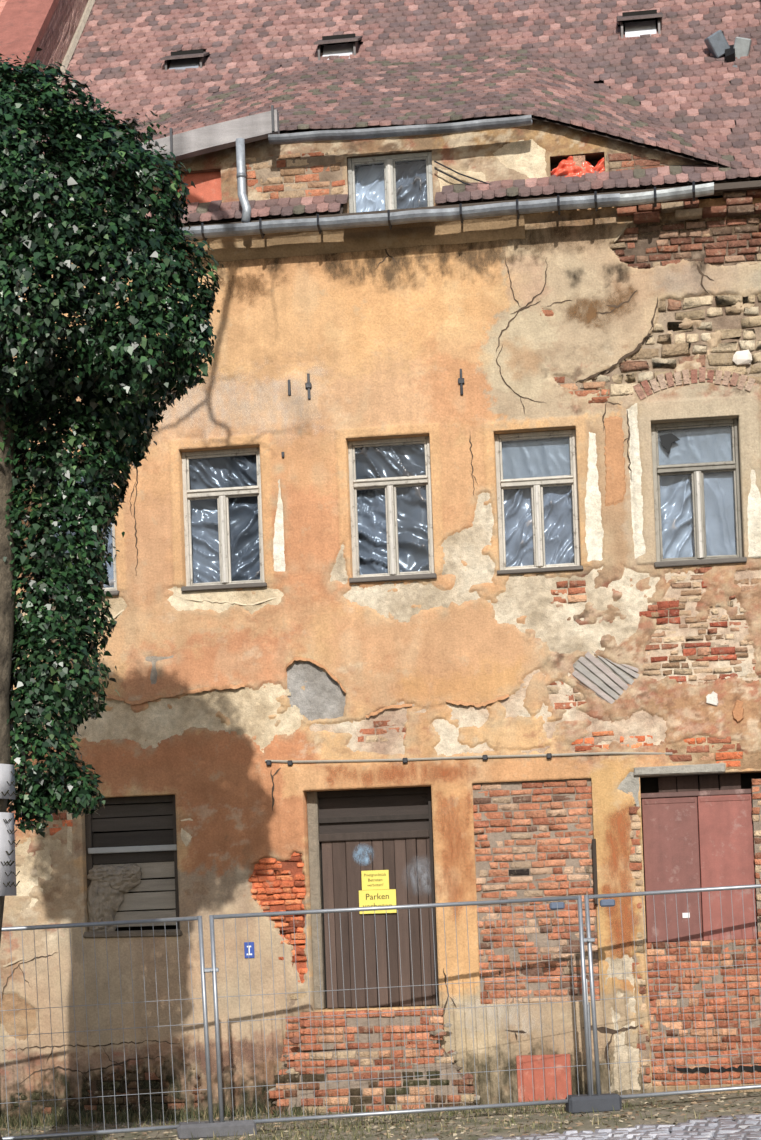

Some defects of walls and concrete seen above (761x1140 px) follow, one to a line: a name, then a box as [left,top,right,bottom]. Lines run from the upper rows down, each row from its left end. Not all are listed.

flaking render [606,152,717,190]
damp [213,259,260,296]
flaking render [609,218,761,269]
crack [697,265,713,294]
crack [496,257,572,414]
crack [576,290,738,481]
crack [130,469,138,573]
flaking render [18,294,761,770]
flaking render [7,779,74,911]
flaking render [181,818,193,846]
crack [2,952,58,999]
flaking render [248,852,308,1075]